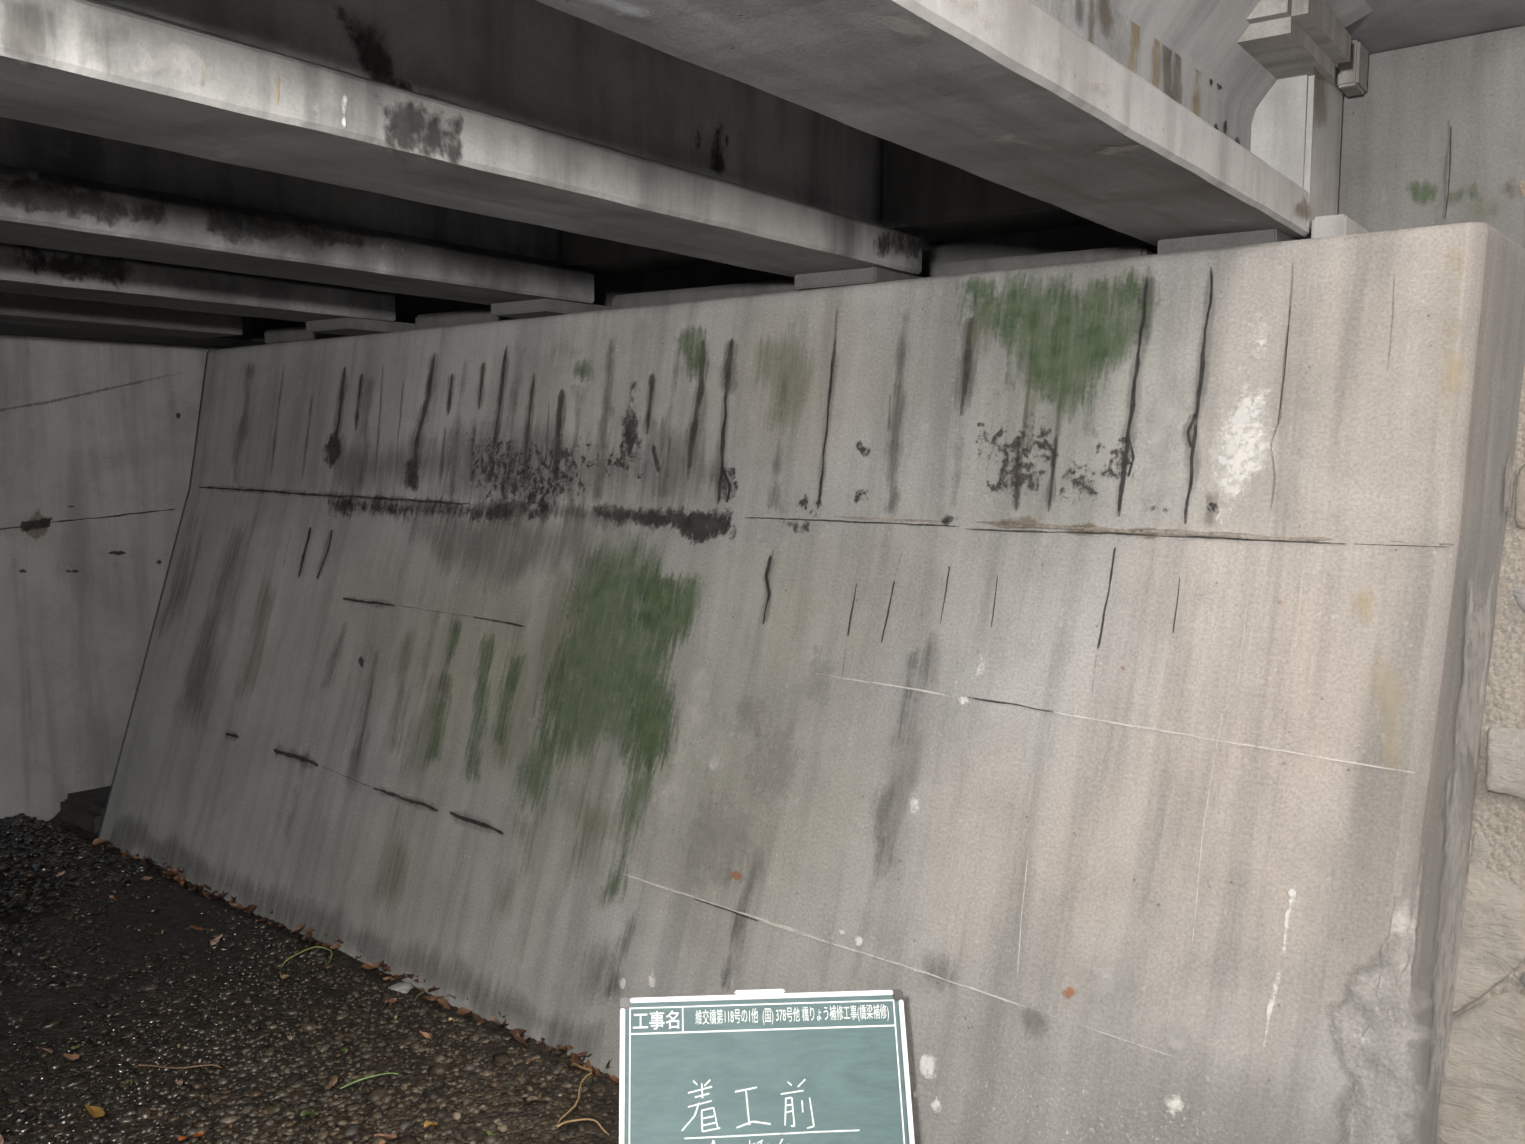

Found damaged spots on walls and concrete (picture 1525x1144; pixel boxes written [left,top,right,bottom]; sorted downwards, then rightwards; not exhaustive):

damp [339,9,463,164]
damp [16,247,129,286]
damp [0,179,165,225]
damp [206,205,412,254]
crack [0,486,469,606]
damp [333,349,660,521]
damp [595,506,734,542]
damp [680,333,705,468]
damp [961,322,973,407]
damp [976,414,1128,528]
crack [718,269,1442,648]
spalling [1330,781,1465,1144]